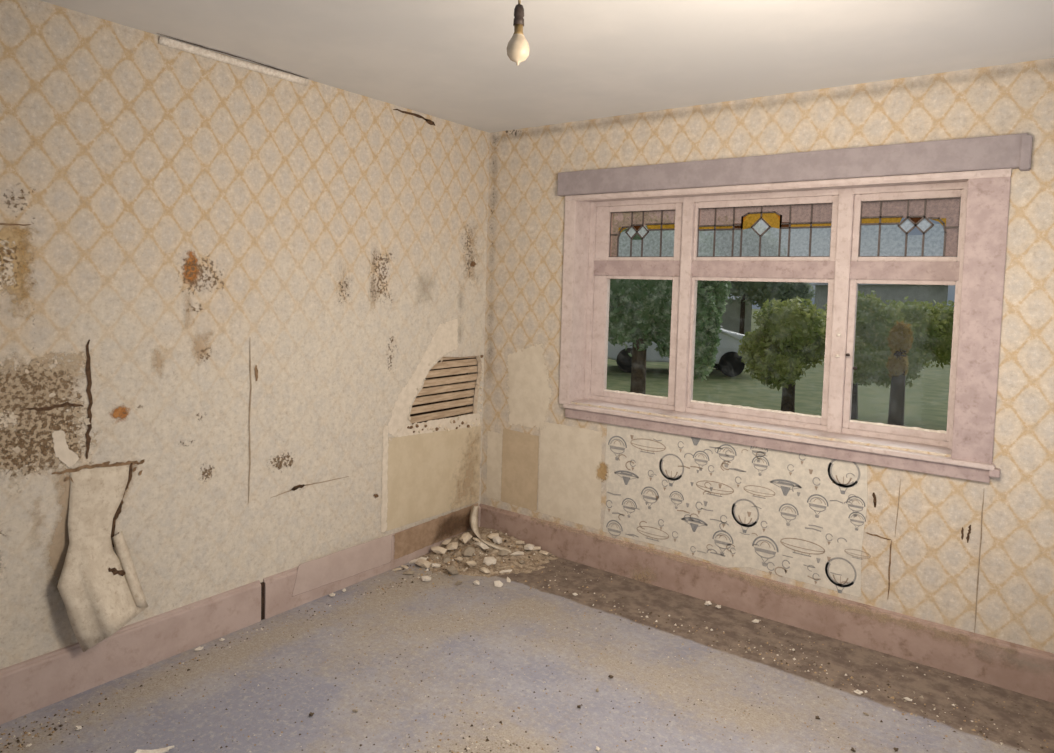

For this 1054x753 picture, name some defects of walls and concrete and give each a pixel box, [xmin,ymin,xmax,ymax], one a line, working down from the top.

flaking render [0,227,31,304]
rust [182,251,224,312]
flaking render [0,352,97,585]
crack [85,340,93,459]
flaking render [386,355,484,559]